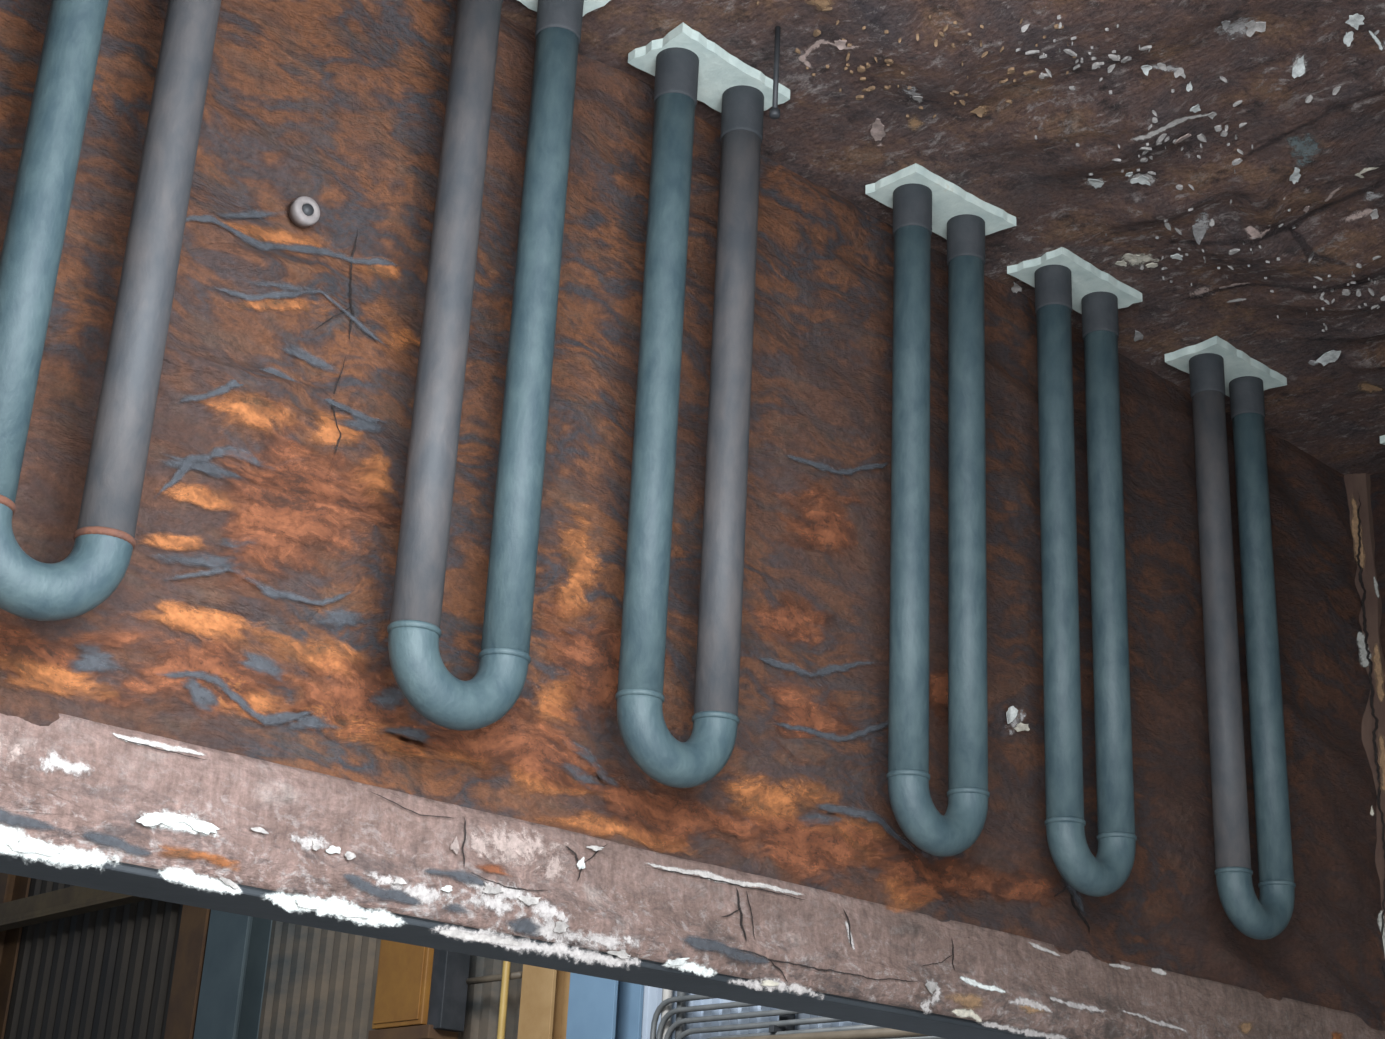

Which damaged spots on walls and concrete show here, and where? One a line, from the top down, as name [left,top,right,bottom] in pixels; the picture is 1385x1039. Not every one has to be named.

rust [224,223,322,248]
rust [361,260,399,279]
rust [241,298,309,311]
rust [382,318,420,352]
crack [1356,497,1385,979]
peeling [136,812,219,835]
peeling [0,825,119,867]
peeling [292,835,356,860]
spalling [450,824,604,878]
peeling [160,868,241,894]
peeling [265,892,404,927]
peeling [369,872,641,966]